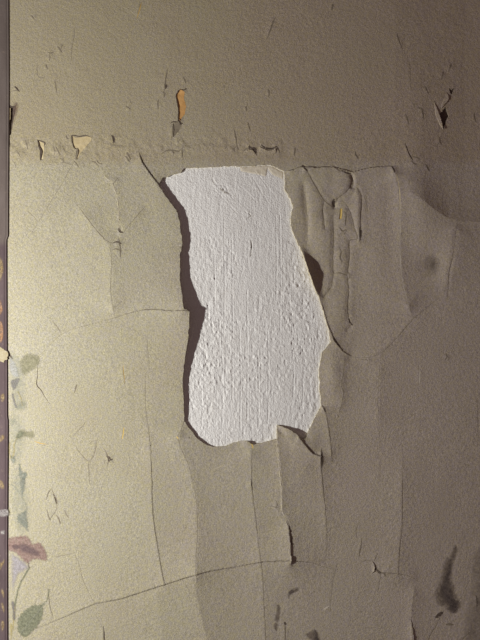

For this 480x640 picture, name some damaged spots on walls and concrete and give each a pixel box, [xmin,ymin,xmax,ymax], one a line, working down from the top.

peeling [71,135,92,160]
peeling [173,89,186,137]
peeling [434,101,449,130]
peeling [107,153,357,585]
crack [304,255,451,528]
crack [35,422,337,635]
crack [355,523,415,626]
water stain [437,547,458,612]